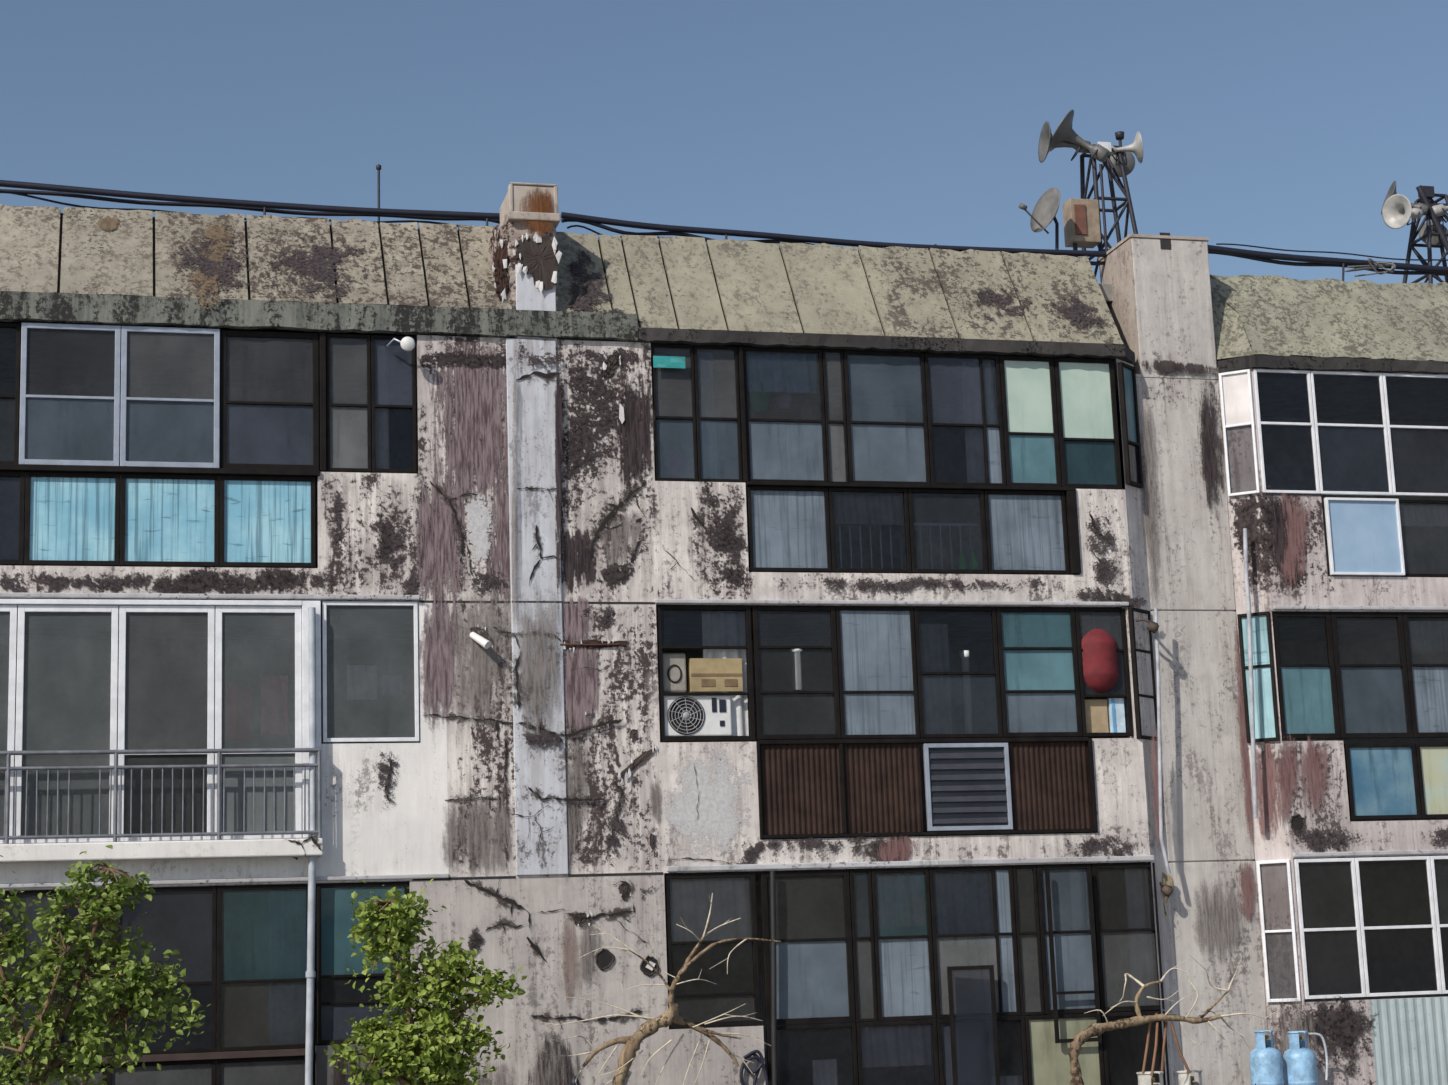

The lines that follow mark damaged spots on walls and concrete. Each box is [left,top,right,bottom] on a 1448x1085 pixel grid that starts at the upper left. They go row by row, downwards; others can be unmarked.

rust [520,188,553,237]
damp [170,230,371,303]
damp [1142,360,1311,590]
mould [0,568,346,594]
damp [331,480,346,551]
damp [367,248,655,875]
mould [699,471,753,589]
damp [475,1033,580,1085]